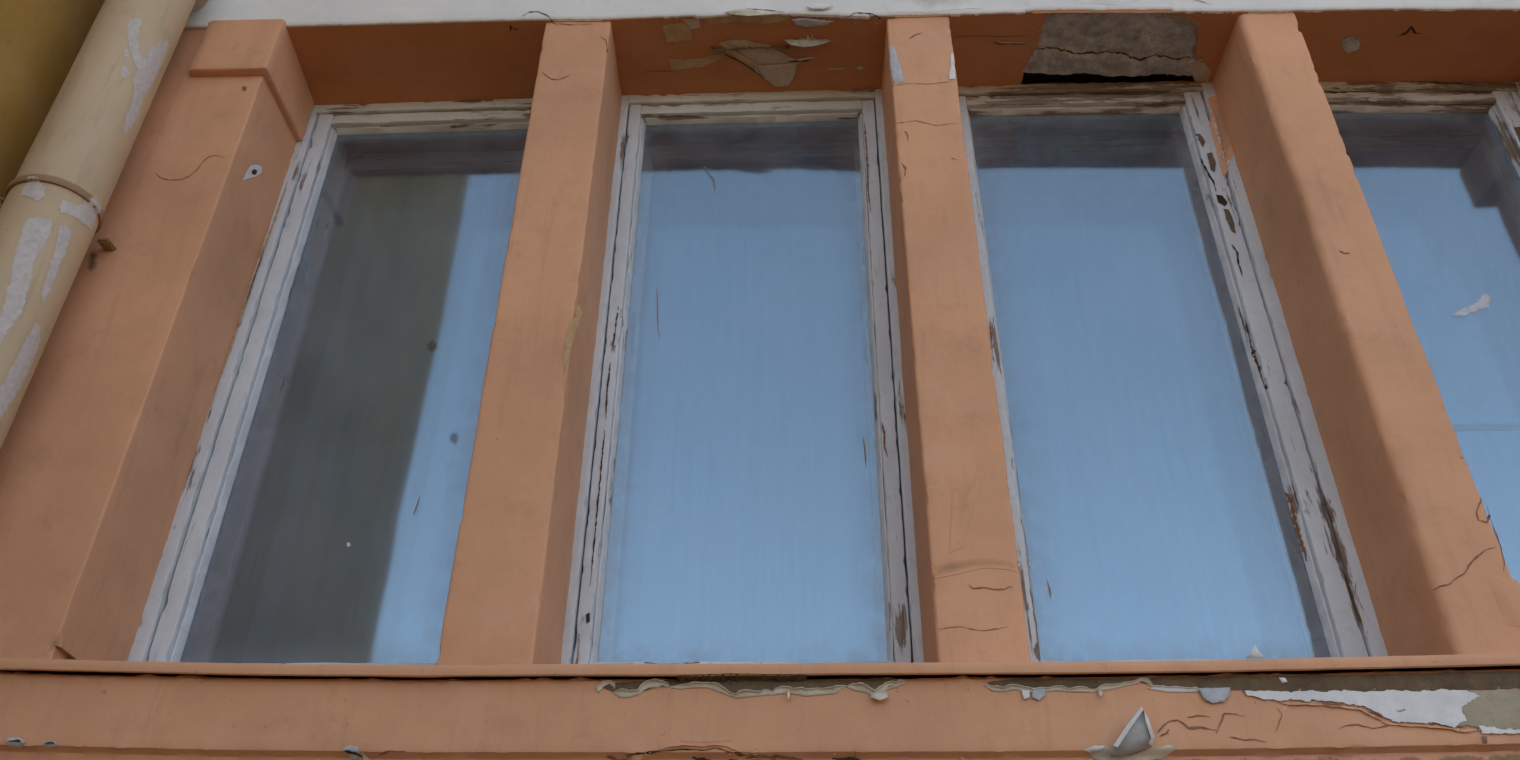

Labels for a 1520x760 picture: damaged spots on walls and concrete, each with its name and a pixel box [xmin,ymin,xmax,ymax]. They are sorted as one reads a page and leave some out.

peeling [647,0,990,87]
spalling [1020,0,1211,84]
crack [1423,498,1505,591]
crack [1352,581,1367,635]
peeling [596,673,907,701]
spalling [984,645,1520,760]
crack [606,732,860,760]